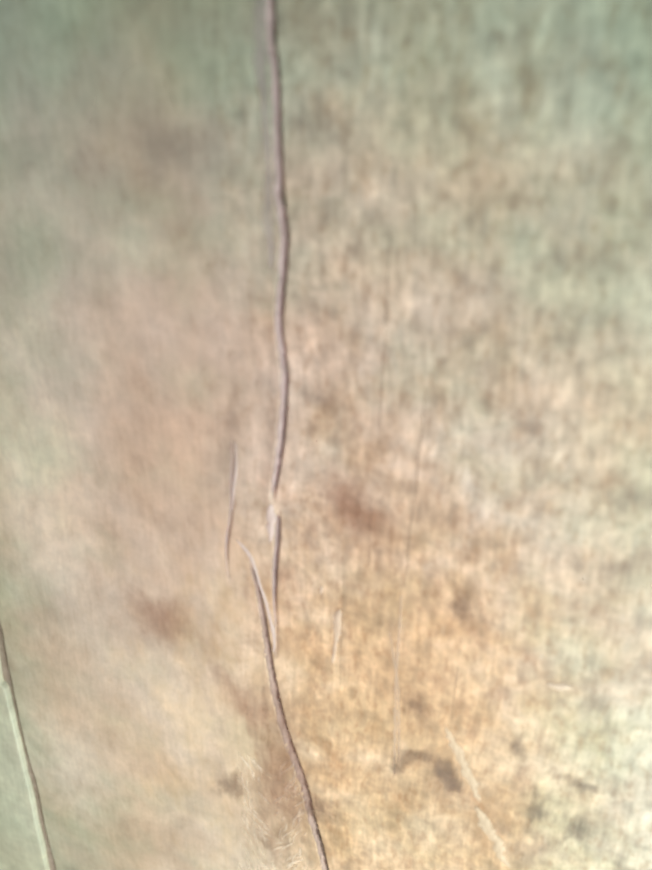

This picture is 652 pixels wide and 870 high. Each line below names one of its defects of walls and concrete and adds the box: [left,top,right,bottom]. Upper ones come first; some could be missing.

crack [225,0,328,870]